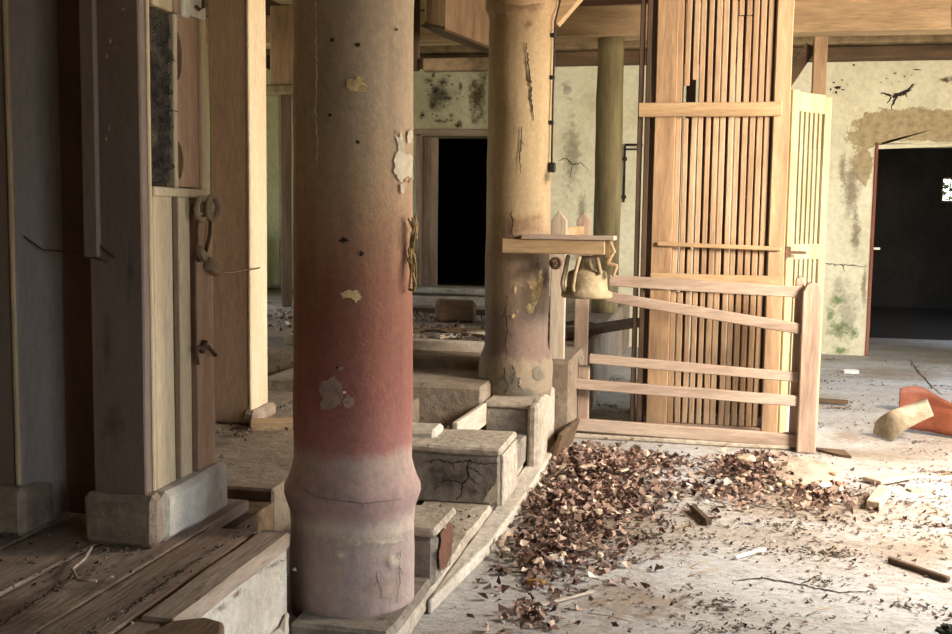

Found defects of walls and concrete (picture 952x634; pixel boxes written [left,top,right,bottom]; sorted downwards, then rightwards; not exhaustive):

leakage [420,73,485,127]
crack [519,43,534,173]
crack [859,84,914,129]
flaking render [840,69,952,187]
peeling [394,130,415,194]
flaking render [340,290,361,303]
flaking render [319,367,355,410]
crack [424,458,493,500]